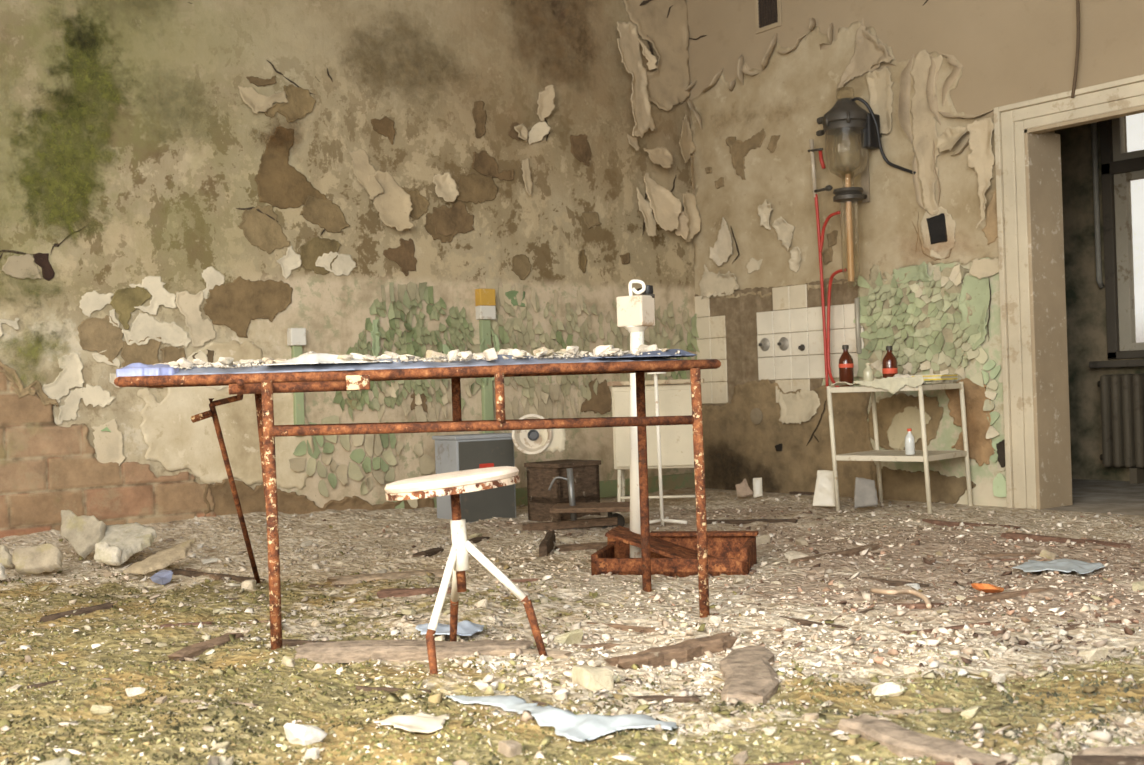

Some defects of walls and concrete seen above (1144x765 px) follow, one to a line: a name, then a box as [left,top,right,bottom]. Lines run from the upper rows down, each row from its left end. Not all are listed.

mould [20,15,125,239]
flaking render [0,75,630,538]
peeling [617,0,1007,504]